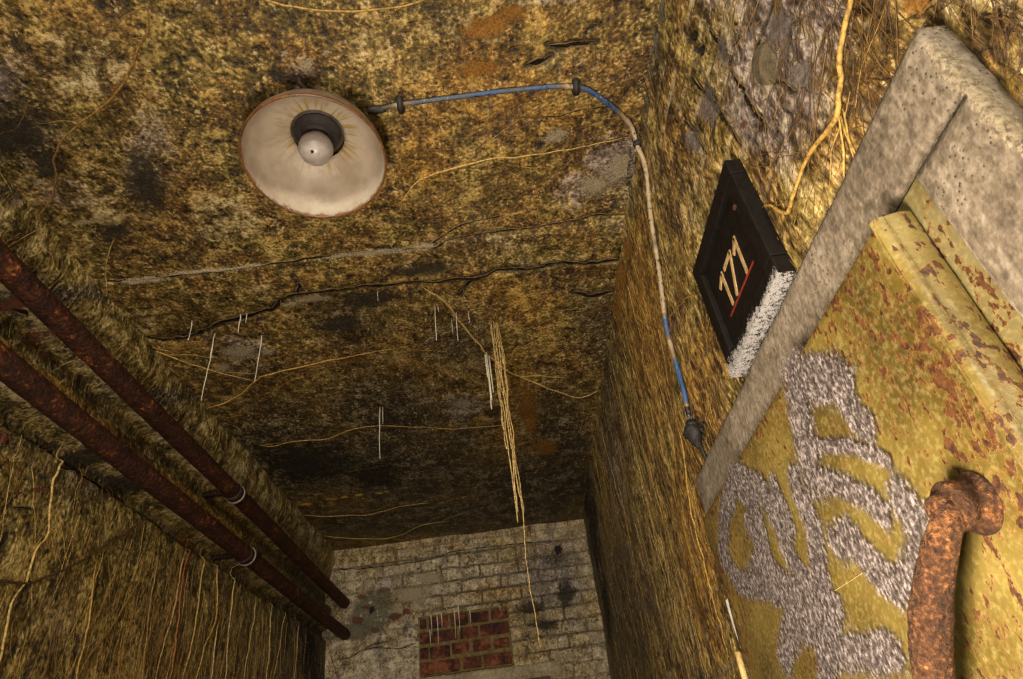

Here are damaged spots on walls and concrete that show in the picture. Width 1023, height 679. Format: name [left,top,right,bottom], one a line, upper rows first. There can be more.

crack [390,213,625,252]
crack [102,252,619,342]
water stain [555,580,577,608]
spalling [346,590,410,641]
water stain [515,600,558,631]